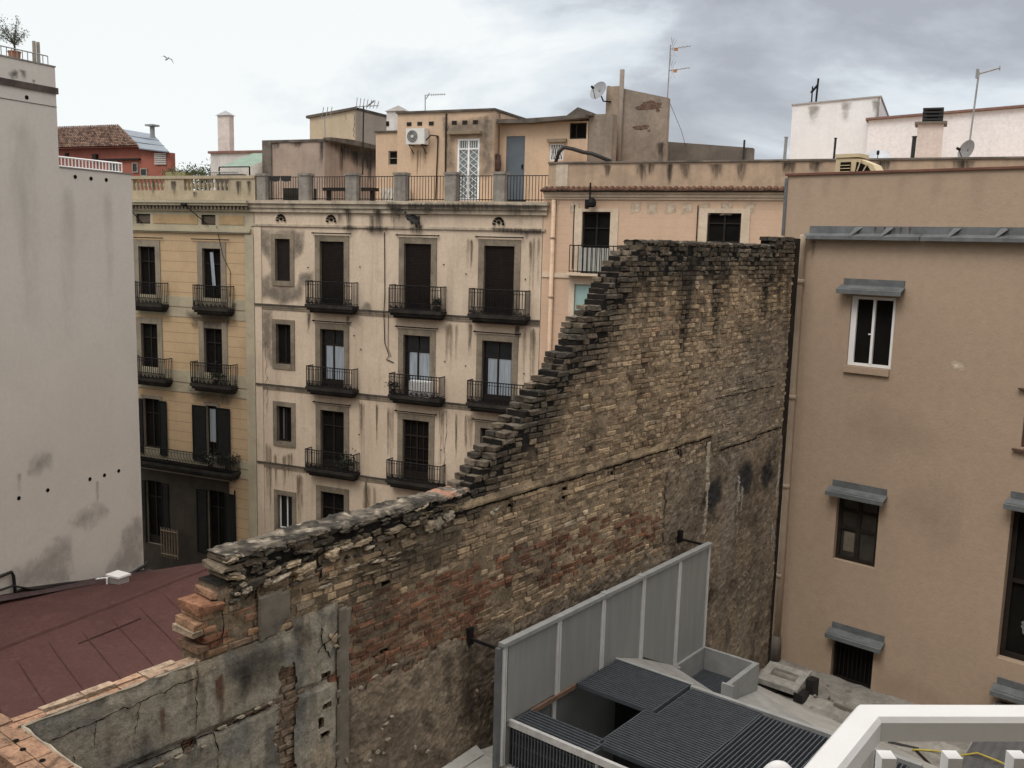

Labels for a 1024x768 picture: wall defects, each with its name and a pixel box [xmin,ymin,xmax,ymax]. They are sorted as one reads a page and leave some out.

spalling [635,100,662,111]
leakage [367,203,539,232]
crack [442,367,782,518]
crack [52,668,272,768]
flaking render [214,661,305,768]